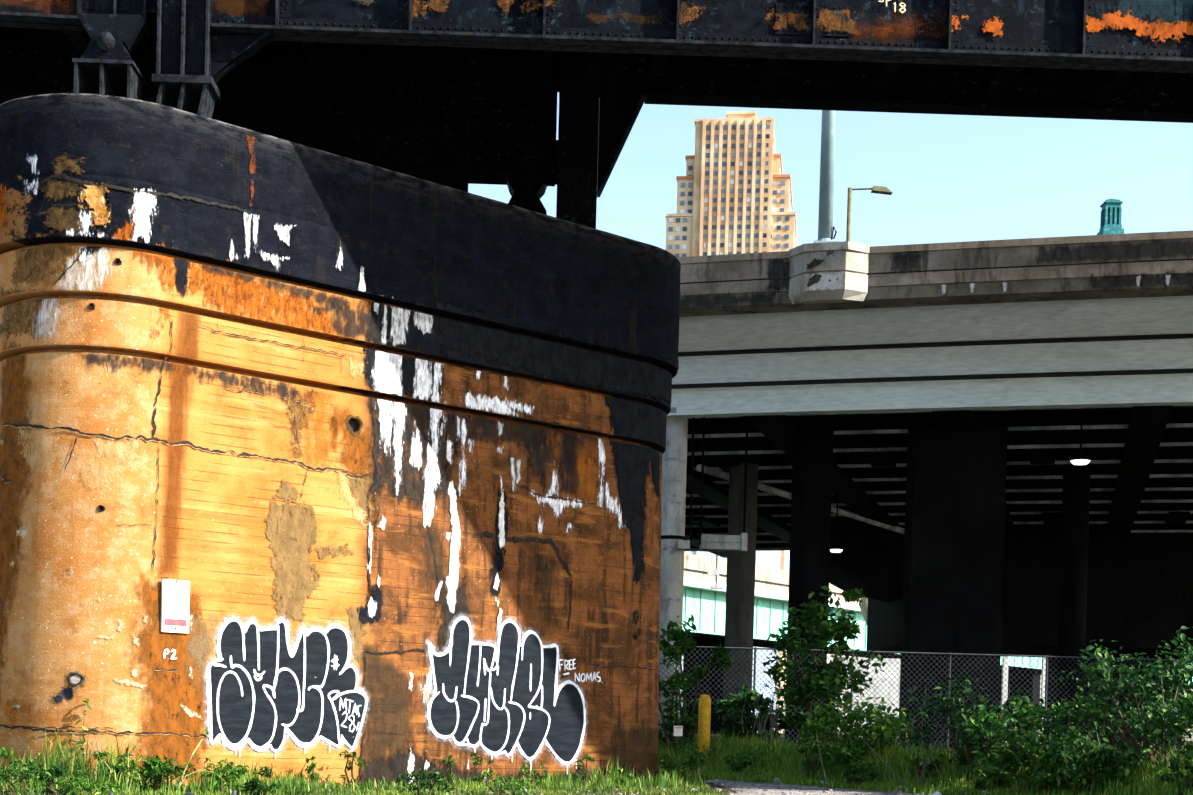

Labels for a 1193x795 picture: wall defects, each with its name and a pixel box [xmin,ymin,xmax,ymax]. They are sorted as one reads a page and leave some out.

spalling [0,154,110,341]
crack [0,321,381,592]
spalling [264,479,354,622]